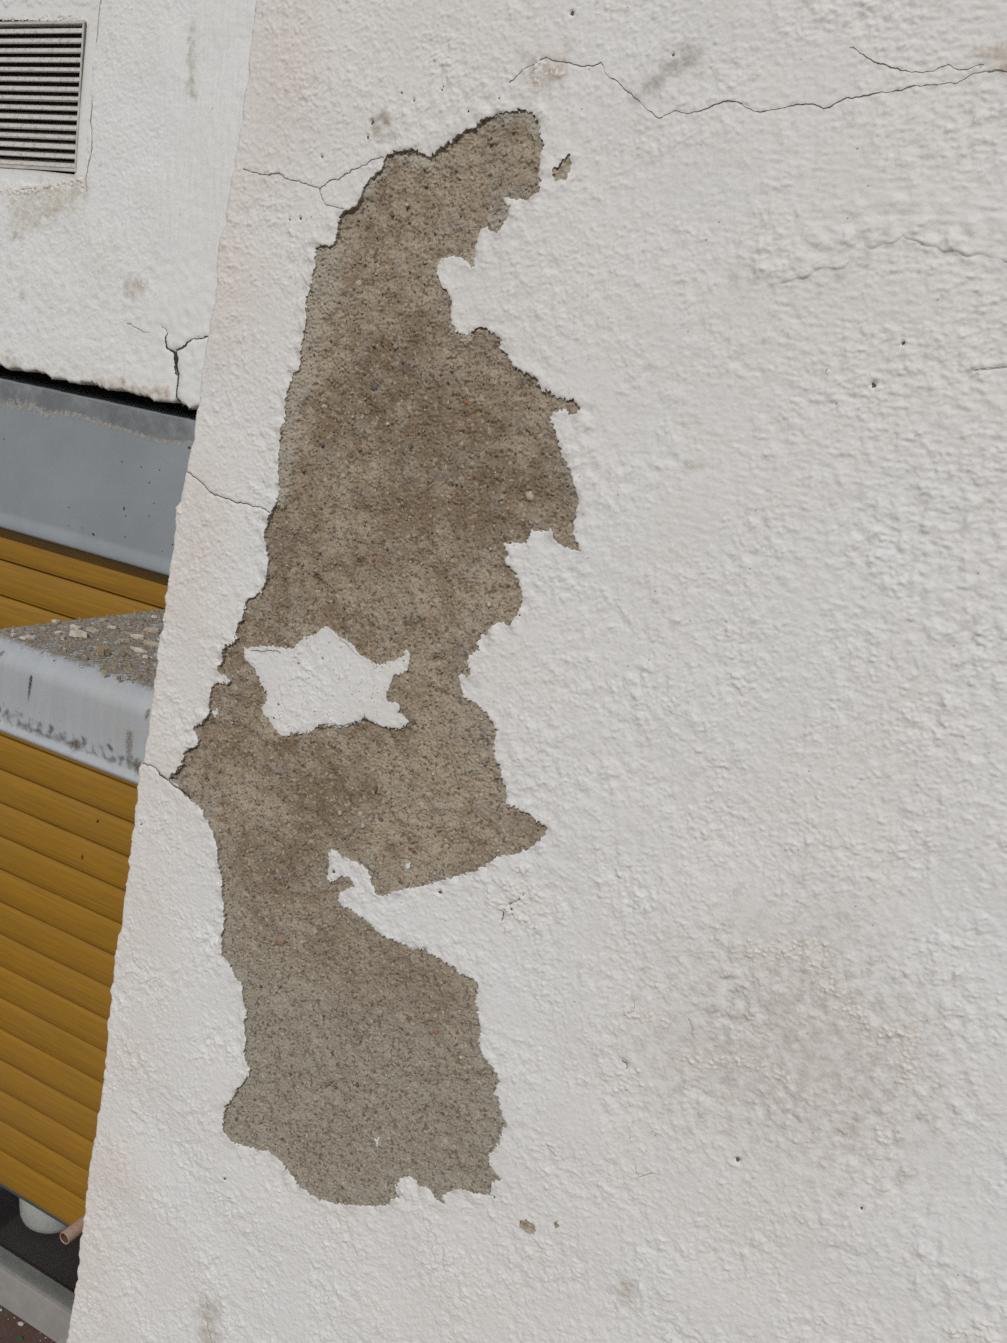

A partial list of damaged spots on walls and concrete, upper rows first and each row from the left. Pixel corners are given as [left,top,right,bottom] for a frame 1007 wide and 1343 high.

crack [510,48,1007,118]
crack [243,157,380,207]
crack [127,323,208,406]
flaking render [169,108,581,1207]